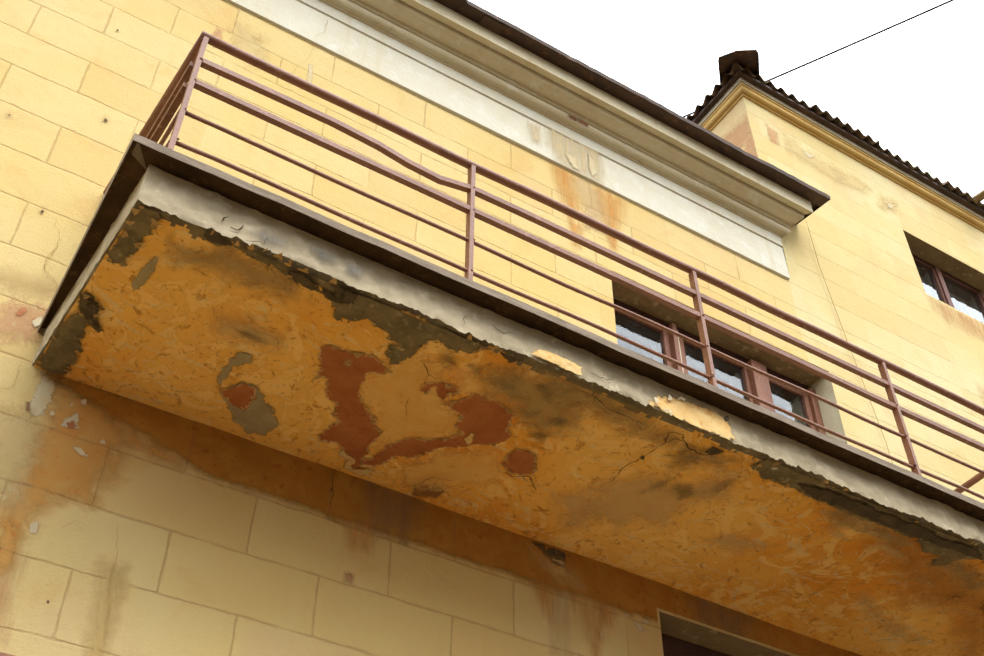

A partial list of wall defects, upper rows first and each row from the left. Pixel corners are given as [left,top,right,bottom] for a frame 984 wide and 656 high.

crack [44,223,60,291]
damp [131,257,158,291]
spalling [26,292,105,428]
damp [217,352,253,387]
peeling [202,229,582,476]
damp [358,350,460,446]
peeling [649,394,739,442]
damp [0,370,863,656]
damp [831,509,983,654]